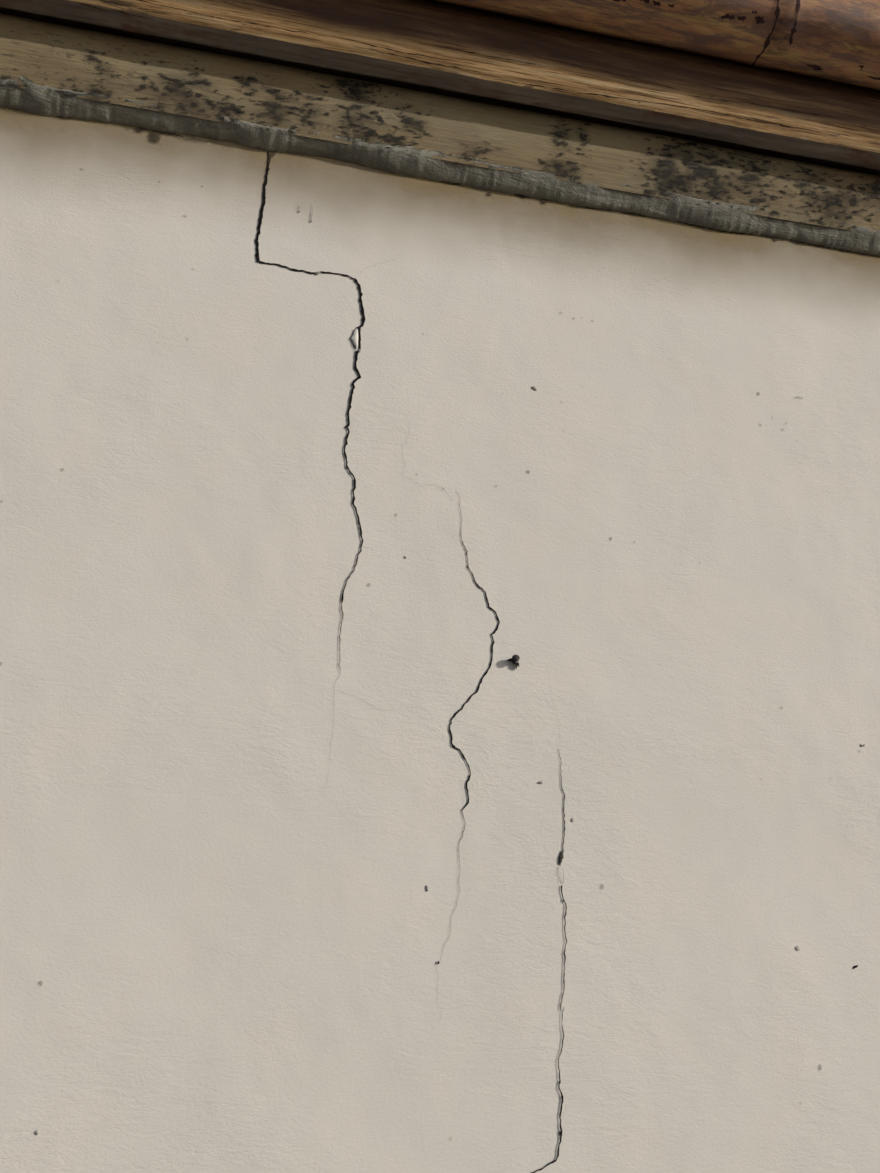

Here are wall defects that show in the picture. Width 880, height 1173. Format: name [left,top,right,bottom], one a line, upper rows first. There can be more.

water stain [46,43,433,151]
water stain [0,107,880,276]
crack [255,151,365,666]
crack [449,511,500,838]
crack [531,754,567,1173]